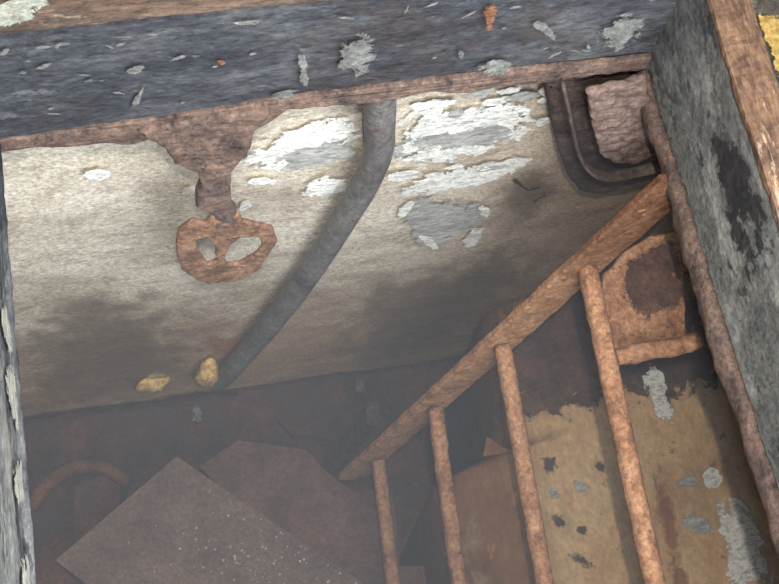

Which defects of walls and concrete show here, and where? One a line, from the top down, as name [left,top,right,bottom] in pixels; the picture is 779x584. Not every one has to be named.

peeling [642,364,675,424]